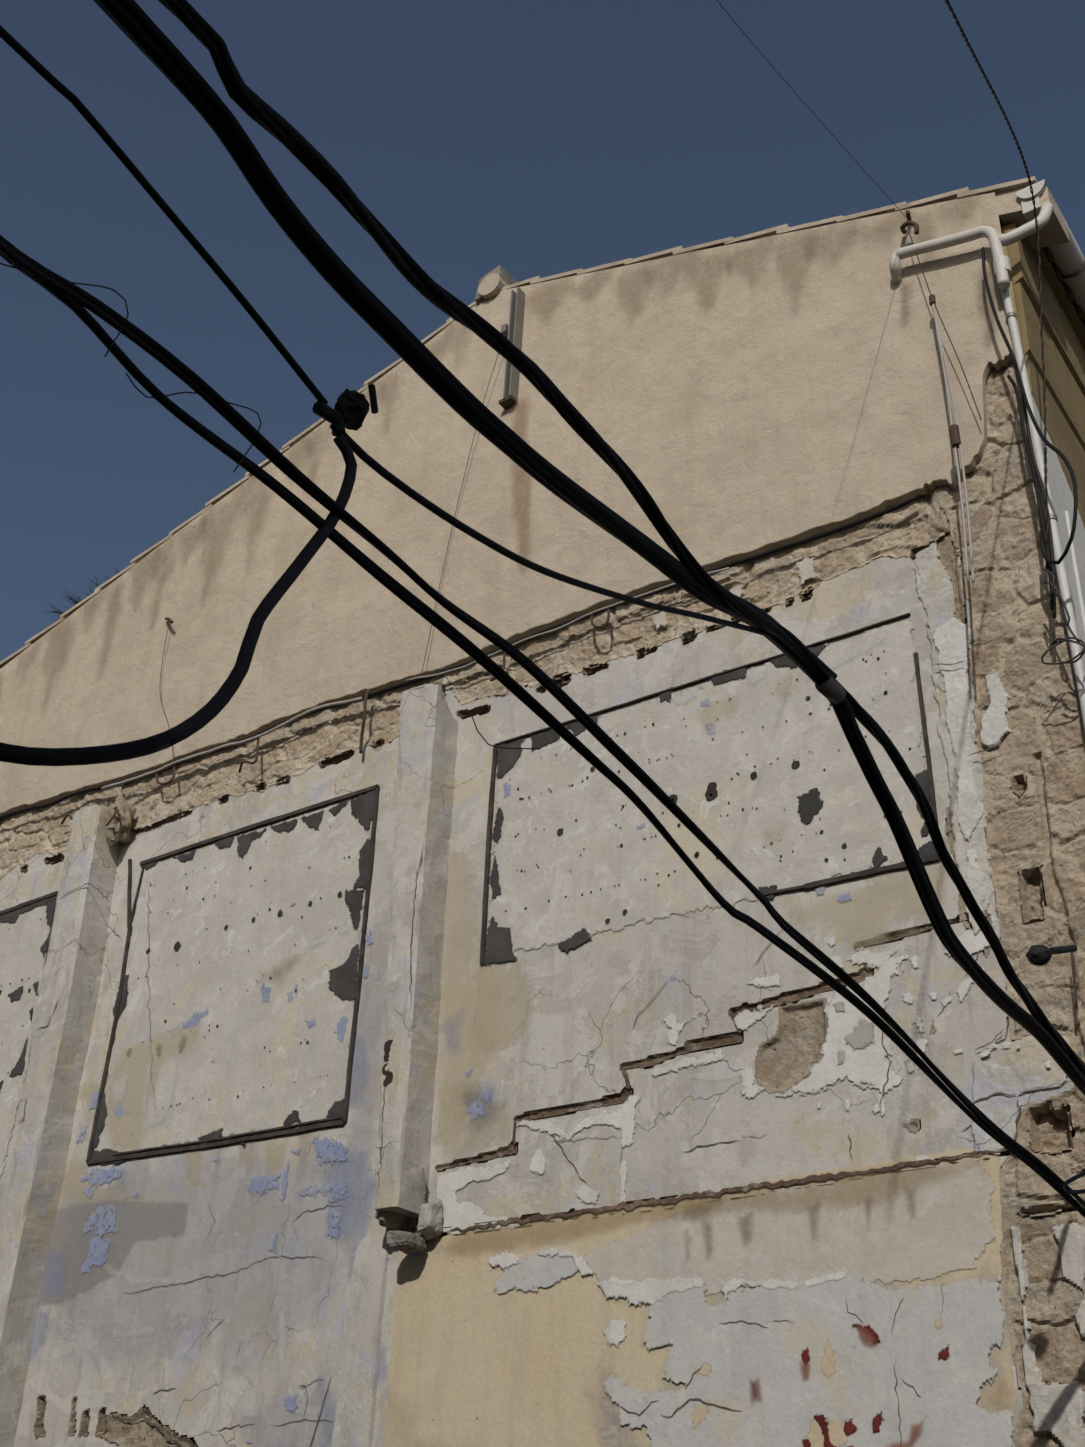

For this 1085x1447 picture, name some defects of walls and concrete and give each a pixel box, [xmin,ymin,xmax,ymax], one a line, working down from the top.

spalling [0,895,56,957]
spalling [214,790,375,1042]
peeling [482,361,1085,1447]
spalling [0,978,39,1089]
spalling [382,1040,393,1087]
peeling [76,1077,140,1274]
peeling [387,1158,530,1235]
rust [858,1326,874,1345]
crack [846,1298,922,1444]
spalling [97,1408,197,1447]
crack [217,1375,332,1447]
rust [892,1425,920,1447]